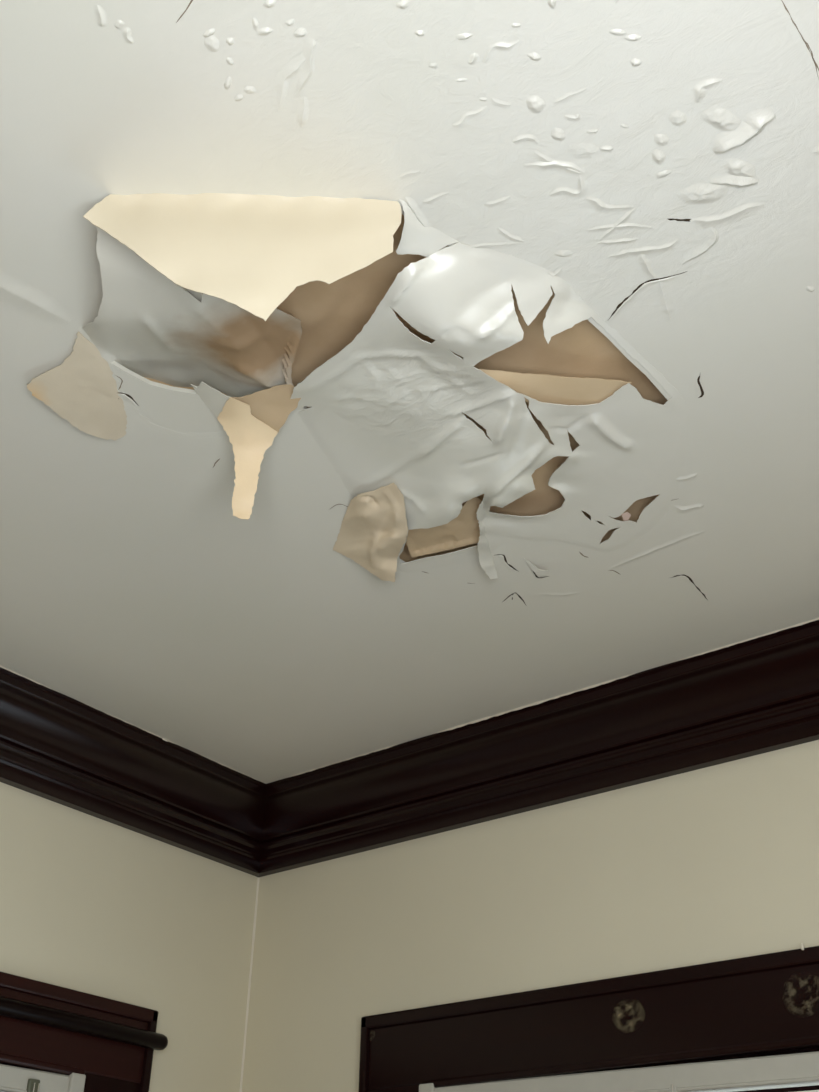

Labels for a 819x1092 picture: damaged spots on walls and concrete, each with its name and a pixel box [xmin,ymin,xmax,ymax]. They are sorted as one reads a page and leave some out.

crack [770,0,819,87]
peeling [27,193,690,582]
crack [494,554,548,607]
crack [669,575,707,601]